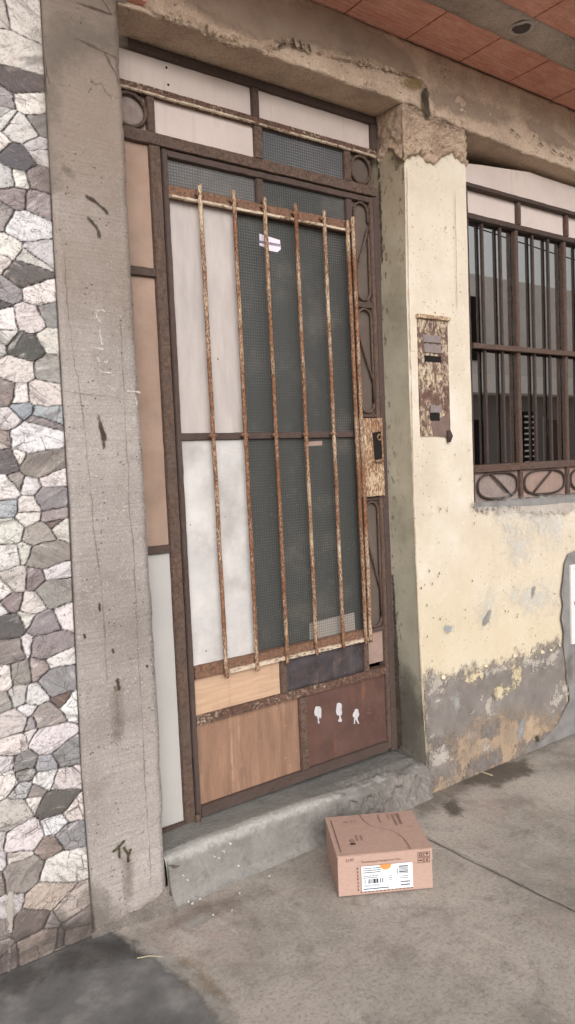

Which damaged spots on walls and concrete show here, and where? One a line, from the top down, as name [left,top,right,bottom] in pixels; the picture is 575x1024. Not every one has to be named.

spalling [149,2,469,262]
peeling [392,578,402,749]
water stain [445,801,462,815]
peeling [423,637,569,794]
water stain [463,760,532,787]